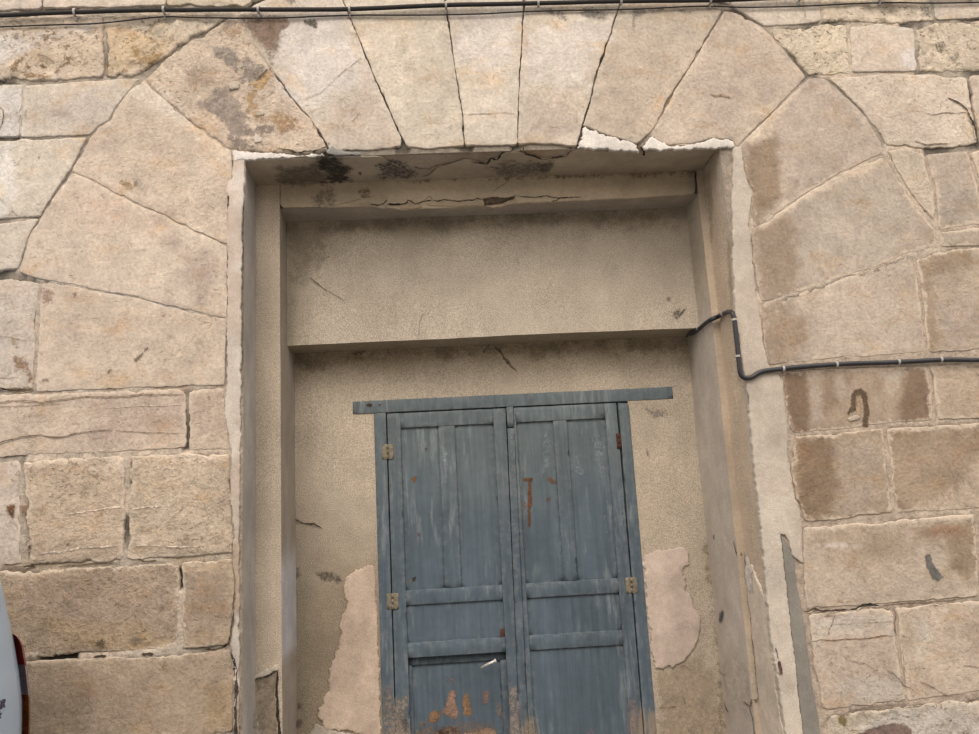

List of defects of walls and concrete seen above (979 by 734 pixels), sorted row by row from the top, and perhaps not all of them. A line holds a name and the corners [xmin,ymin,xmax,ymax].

damp [277,154,361,206]
damp [375,160,430,182]
crack [333,146,581,206]